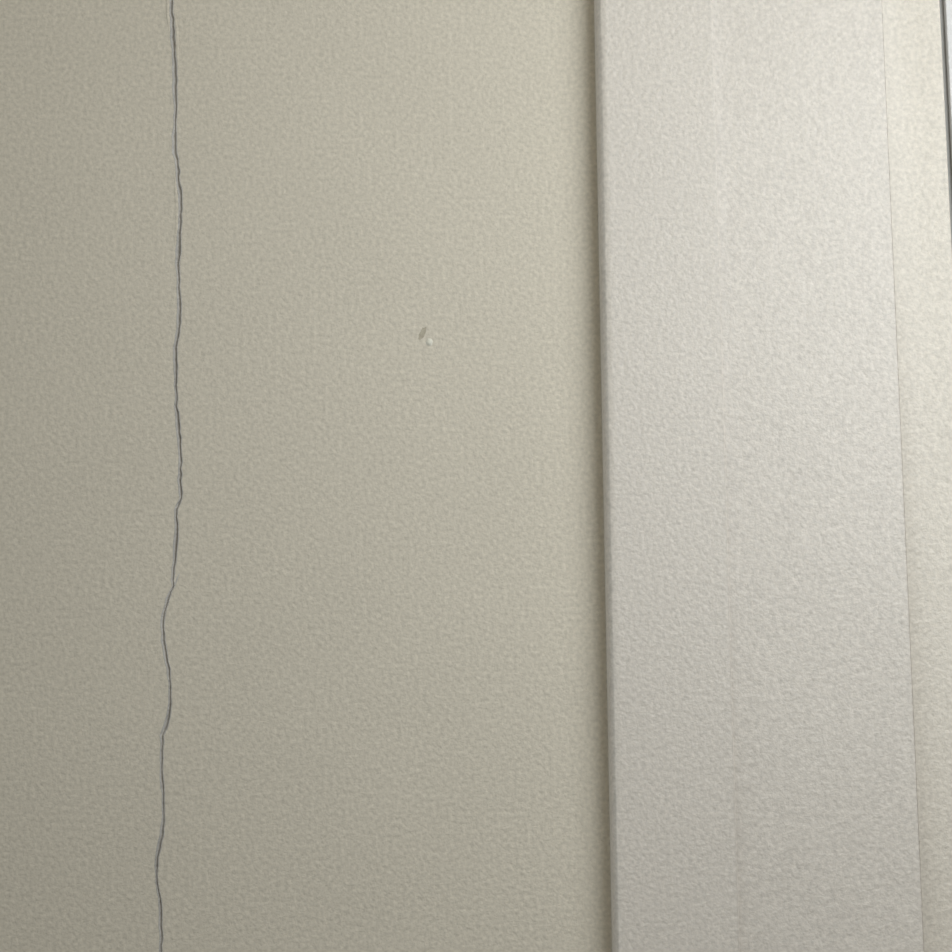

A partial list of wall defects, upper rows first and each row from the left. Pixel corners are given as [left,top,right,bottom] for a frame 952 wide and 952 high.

crack [154,0,183,952]